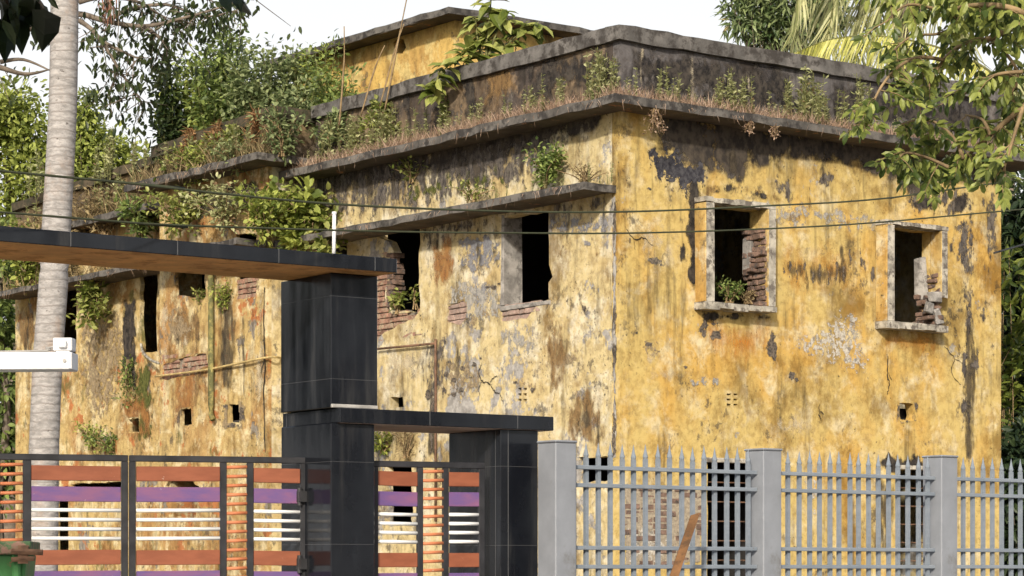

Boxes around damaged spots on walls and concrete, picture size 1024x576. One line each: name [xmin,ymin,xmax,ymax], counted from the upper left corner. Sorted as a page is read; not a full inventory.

water stain [462,74,492,118]
water stain [528,50,610,101]
rust [434,233,454,282]
spalling [448,230,543,360]
water stain [651,116,997,458]
flaking render [161,353,208,380]
crack [478,365,503,401]
water stain [547,326,567,388]
peeling [793,309,869,371]
water stain [568,390,603,444]